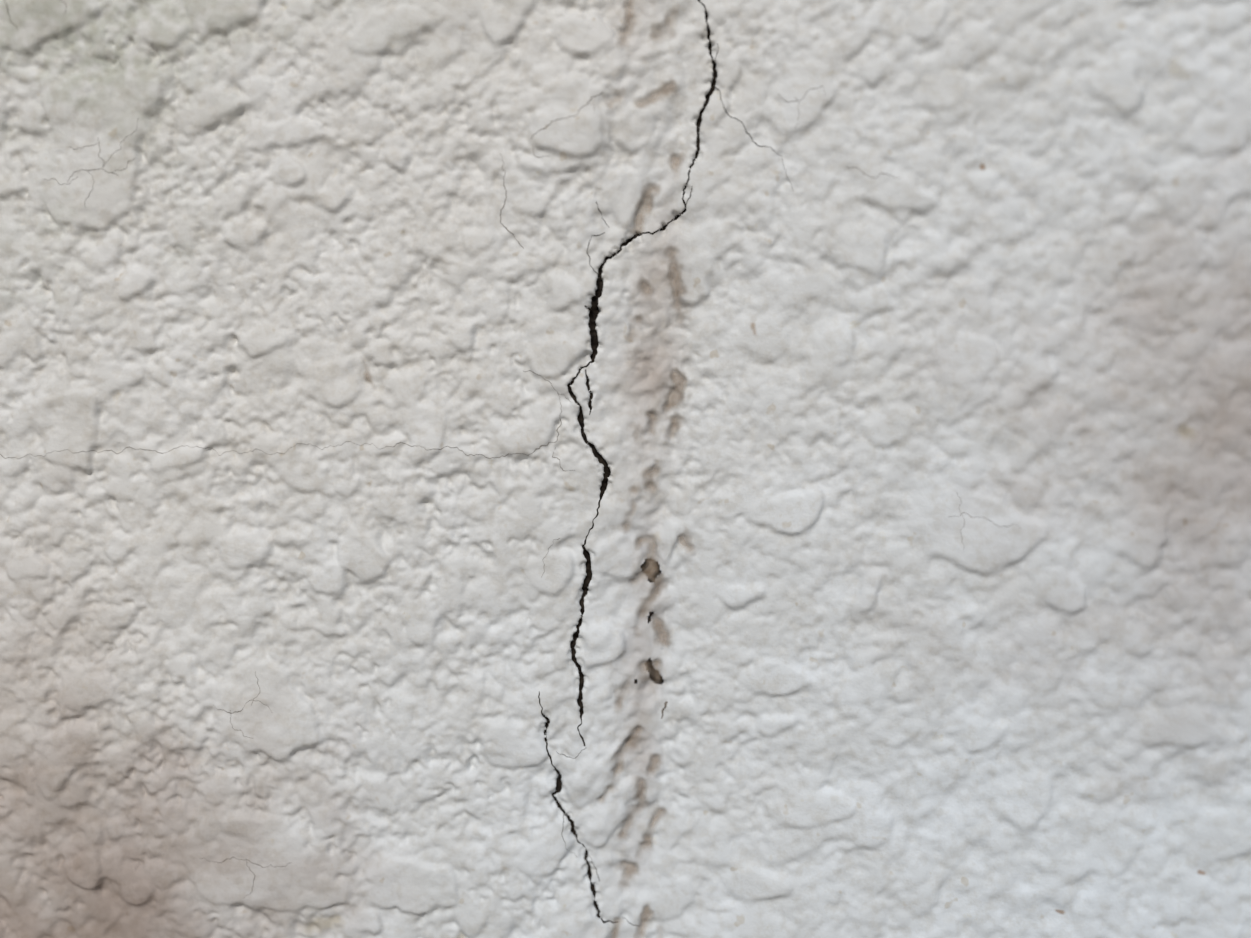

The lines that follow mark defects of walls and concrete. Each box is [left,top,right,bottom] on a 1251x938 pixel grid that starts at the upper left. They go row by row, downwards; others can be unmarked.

crack [0,0,793,926]